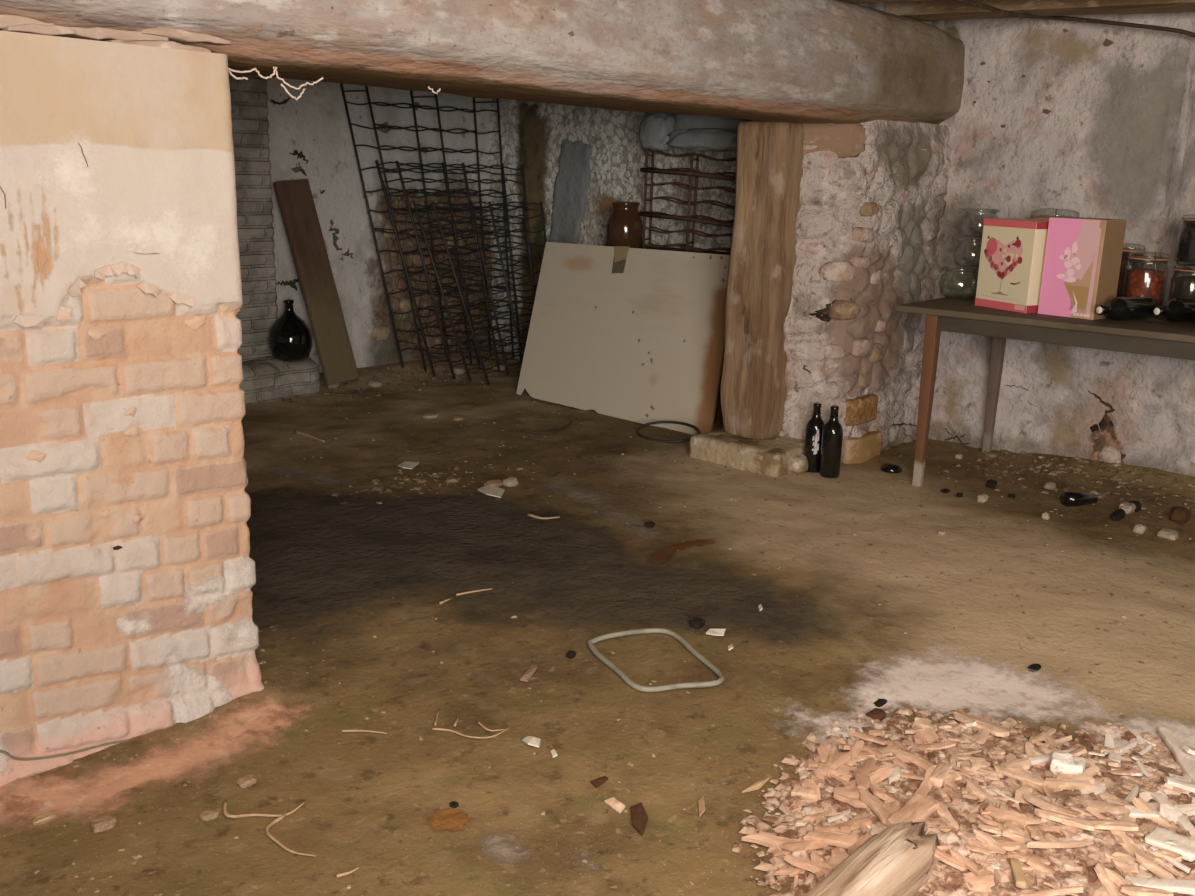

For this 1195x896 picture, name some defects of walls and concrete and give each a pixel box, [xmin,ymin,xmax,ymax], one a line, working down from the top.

rust [19,219,56,281]
peeling [13,262,206,329]
spalling [1090,415,1126,464]
leakage [183,468,821,641]
leakage [116,616,150,635]
leakage [163,651,232,725]